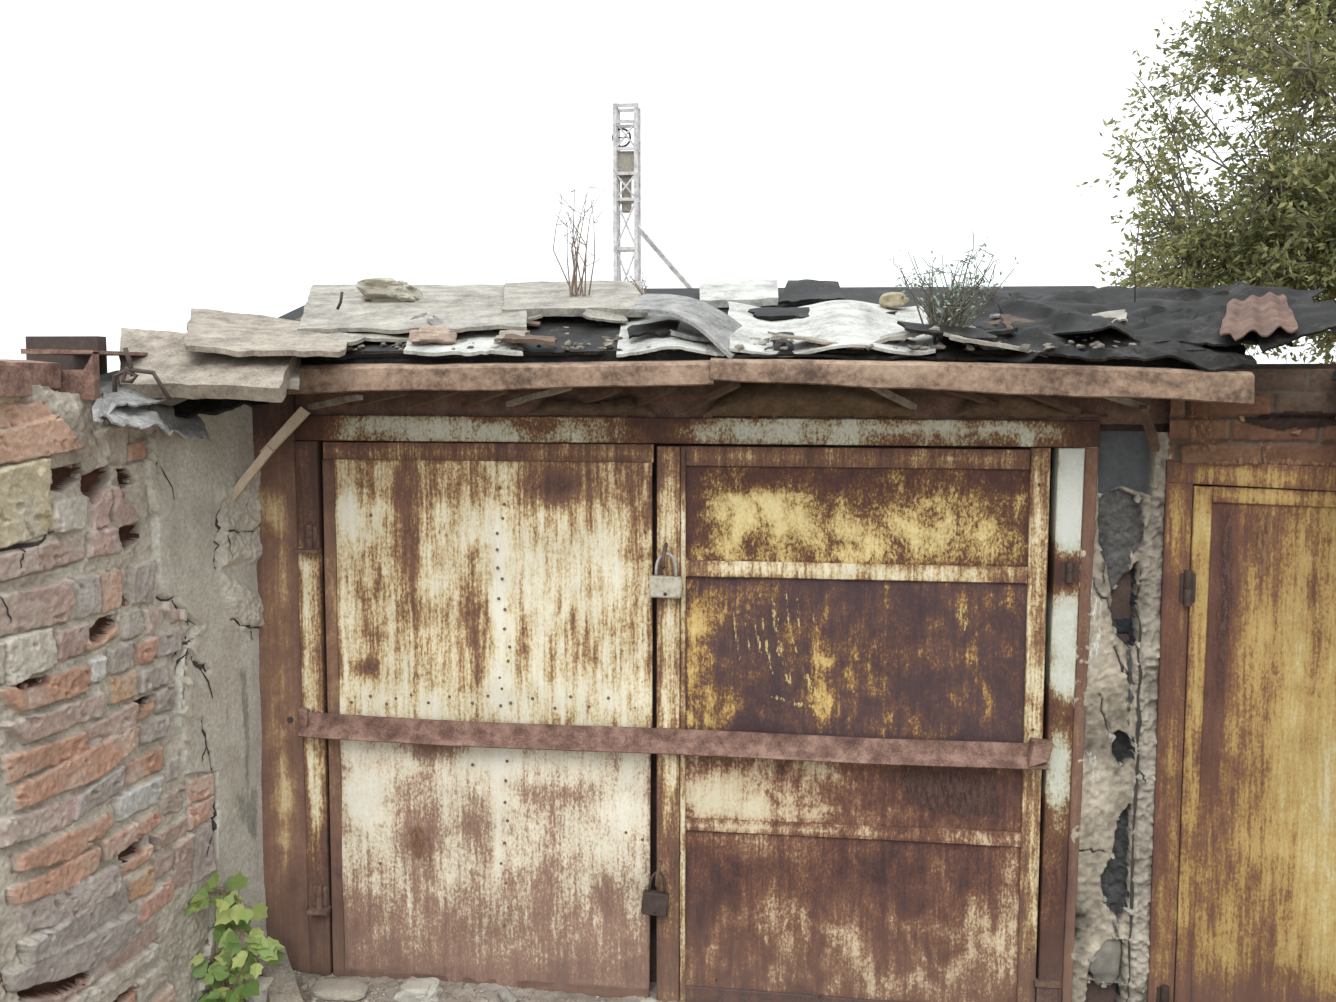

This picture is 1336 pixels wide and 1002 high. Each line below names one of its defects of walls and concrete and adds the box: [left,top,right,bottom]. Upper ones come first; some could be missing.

peeling [142,425,162,514]
spalling [1097,489,1144,649]
peeling [171,596,206,741]
spalling [1108,730,1135,767]
spalling [1101,804,1134,914]
spalling [1085,939,1125,1002]